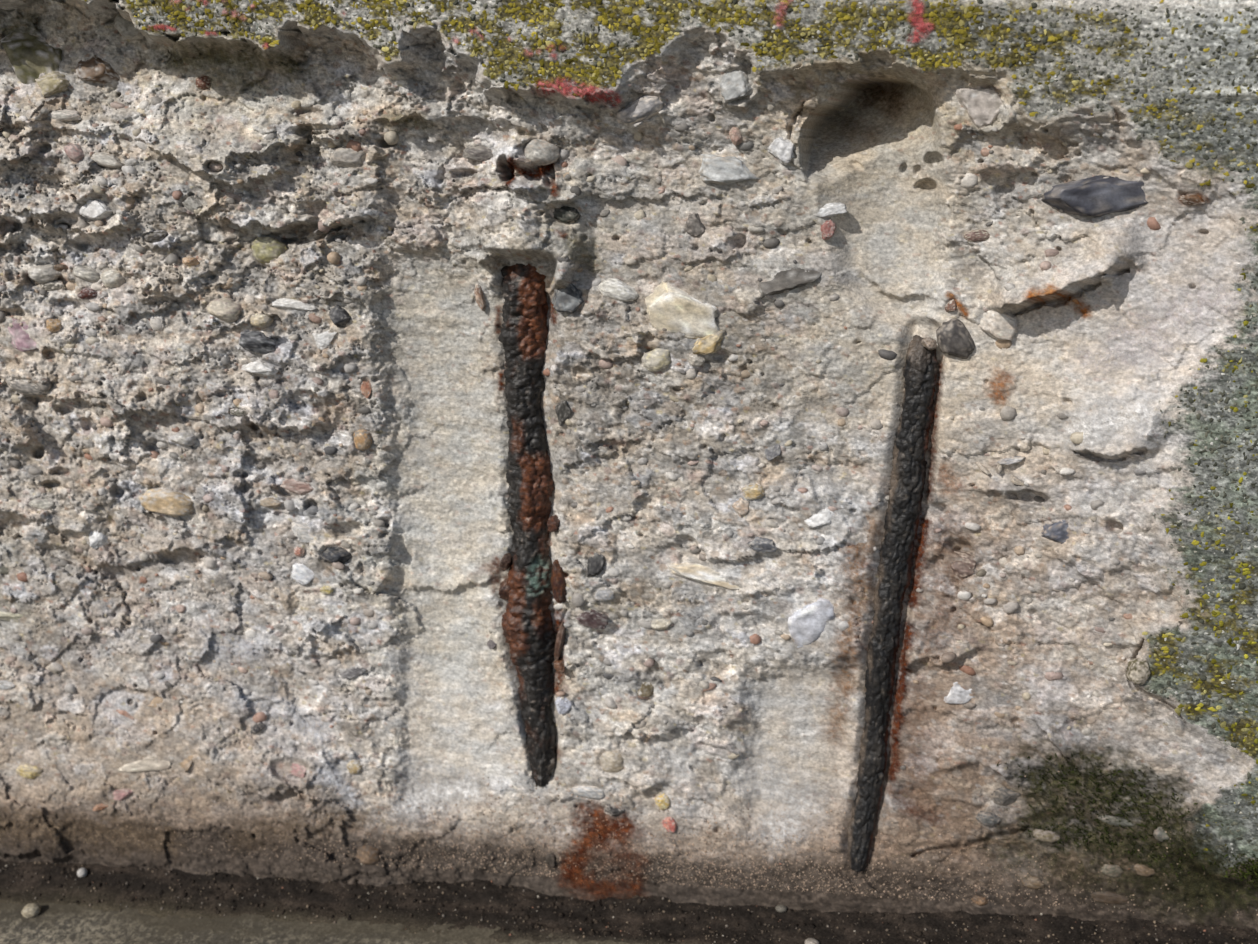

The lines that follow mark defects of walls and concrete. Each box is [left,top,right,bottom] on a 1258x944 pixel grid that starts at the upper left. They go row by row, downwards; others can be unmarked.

corrosion [505,157,558,196]
spalling [813,202,847,218]
spalling [474,283,487,311]
corrosion [491,553,512,601]
corrosion [551,559,567,694]
spalling [571,592,586,608]
spalling [957,591,972,601]
spalling [1003,602,1019,613]
spalling [497,623,528,752]
corrosion [888,621,941,781]
corrosion [561,803,641,895]
leakage [999,796,1258,915]